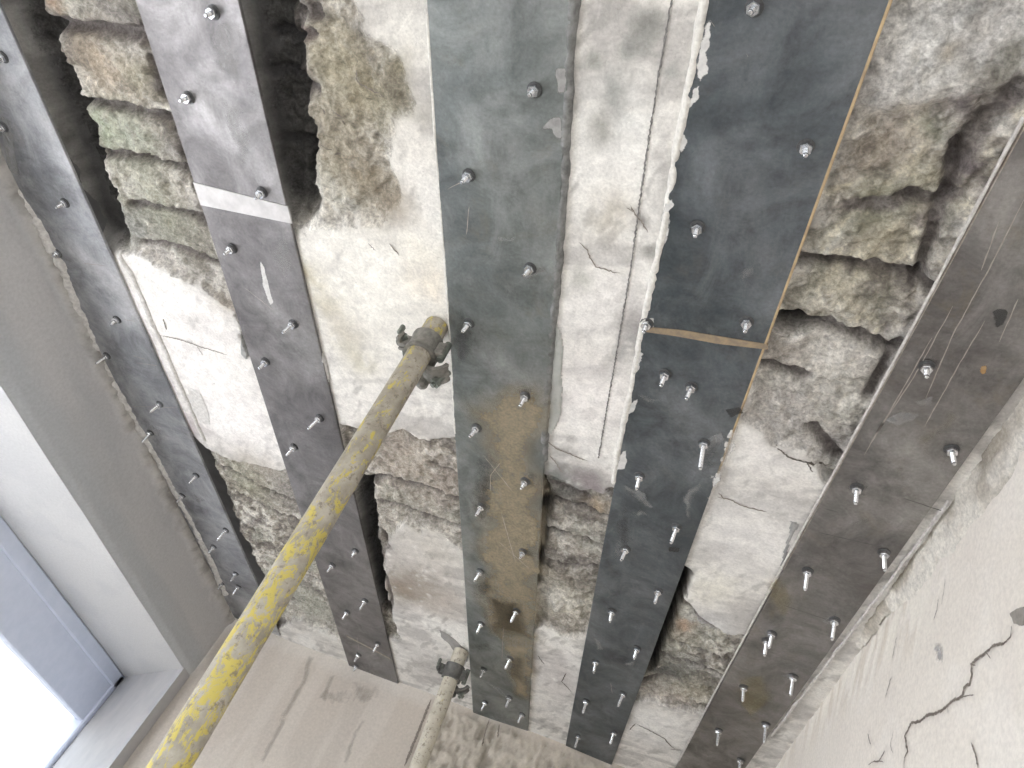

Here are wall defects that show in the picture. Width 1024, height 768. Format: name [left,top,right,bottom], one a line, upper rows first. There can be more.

spalling [26,0,243,339]
spalling [263,0,417,238]
spalling [740,0,1024,483]
spalling [339,424,358,448]
spalling [354,429,462,640]
corrosion [477,390,544,697]
spalling [535,474,614,640]
spalling [635,565,746,715]
crack [868,626,1012,765]